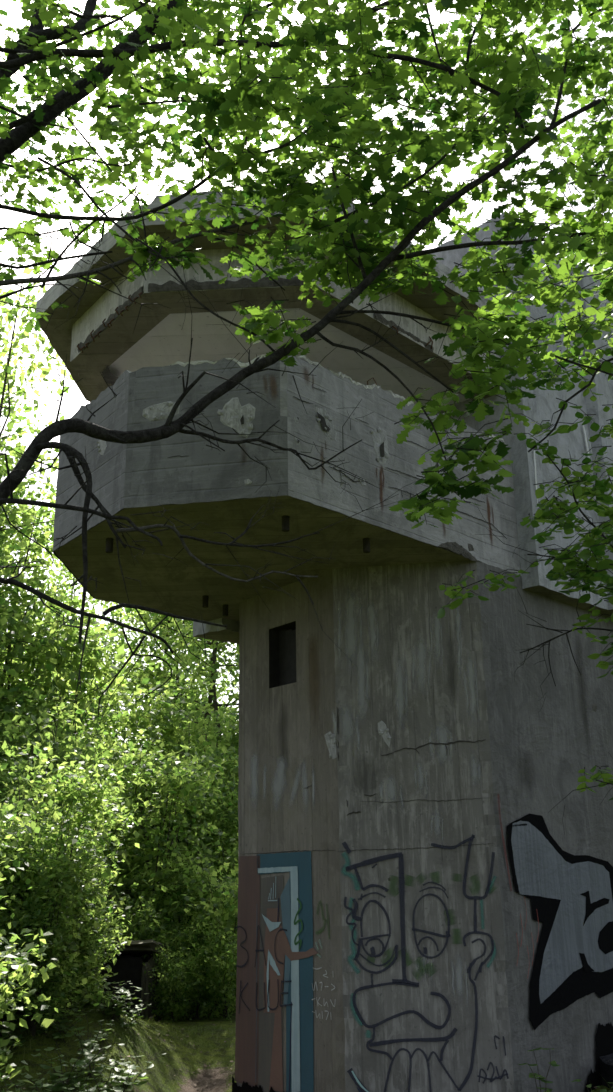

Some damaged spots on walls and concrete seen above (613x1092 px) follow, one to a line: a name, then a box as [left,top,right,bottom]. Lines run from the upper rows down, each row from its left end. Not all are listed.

spalling [296,355,415,406]
spalling [142,401,180,421]
spalling [217,397,256,438]
spalling [324,731,337,759]
spalling [378,721,391,747]
crack [381,739,486,756]